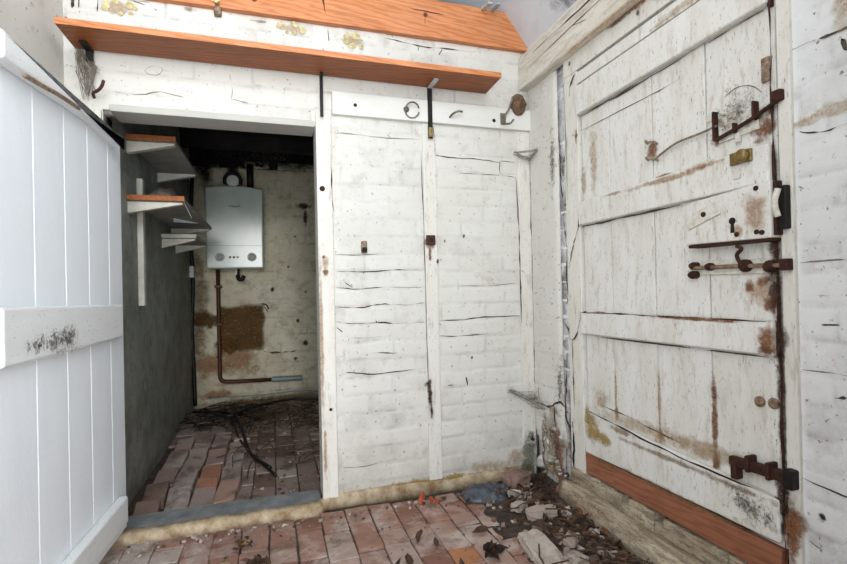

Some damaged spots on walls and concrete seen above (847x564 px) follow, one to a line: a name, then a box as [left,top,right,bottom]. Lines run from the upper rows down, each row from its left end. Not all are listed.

crack [533,0,600,52]
rust [754,109,775,143]
rust [745,241,786,469]
damp [585,406,610,445]
damp [615,429,695,470]
rust [776,481,805,563]